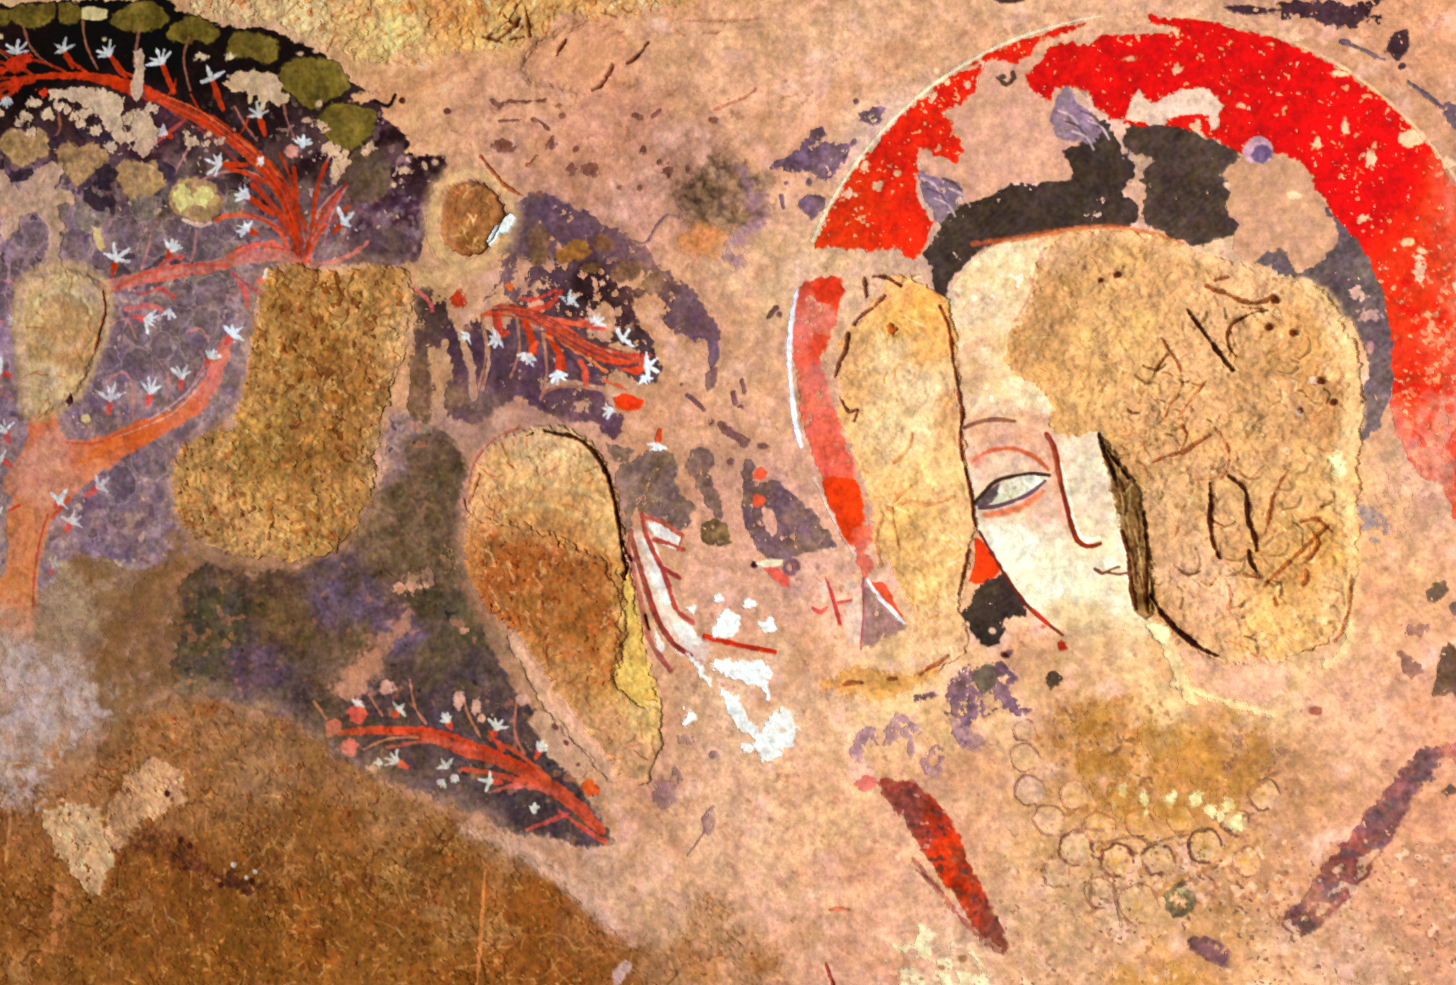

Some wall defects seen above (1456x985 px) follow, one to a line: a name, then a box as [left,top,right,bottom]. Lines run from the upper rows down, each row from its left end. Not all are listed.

peeling [0,49,160,158]
peeling [183,131,227,151]
peeling [302,100,379,186]
flaking render [0,157,114,423]
flaking render [171,159,520,564]
flaking render [463,425,664,786]
flaking render [820,275,978,701]
flaking render [1003,153,1367,719]
flaking render [0,697,802,985]